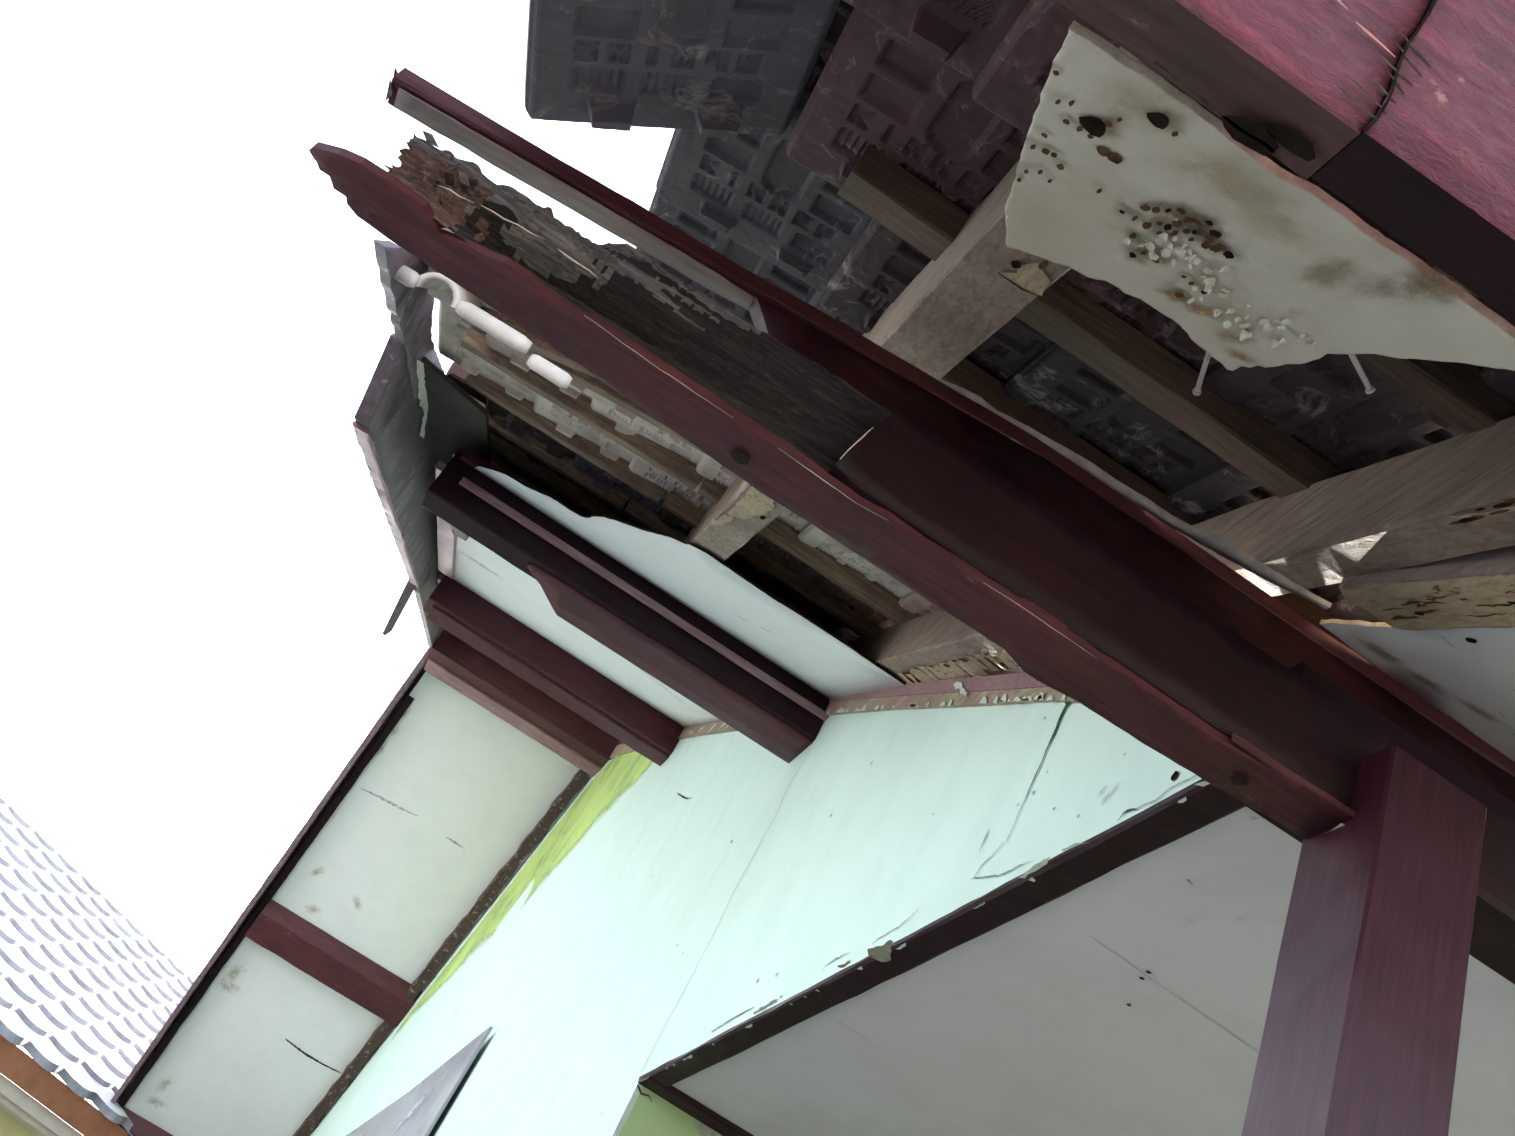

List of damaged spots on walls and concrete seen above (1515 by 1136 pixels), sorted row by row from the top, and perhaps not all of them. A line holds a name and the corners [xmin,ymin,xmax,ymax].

peeling [1337,0,1395,57]
spalling [1055,99,1123,164]
spalling [1017,133,1064,183]
spalling [1011,261,1048,269]
peeling [1119,204,1316,348]
peeling [826,698,952,714]
peeling [979,692,1065,703]
crack [971,702,1072,879]
crack [285,1039,341,1073]